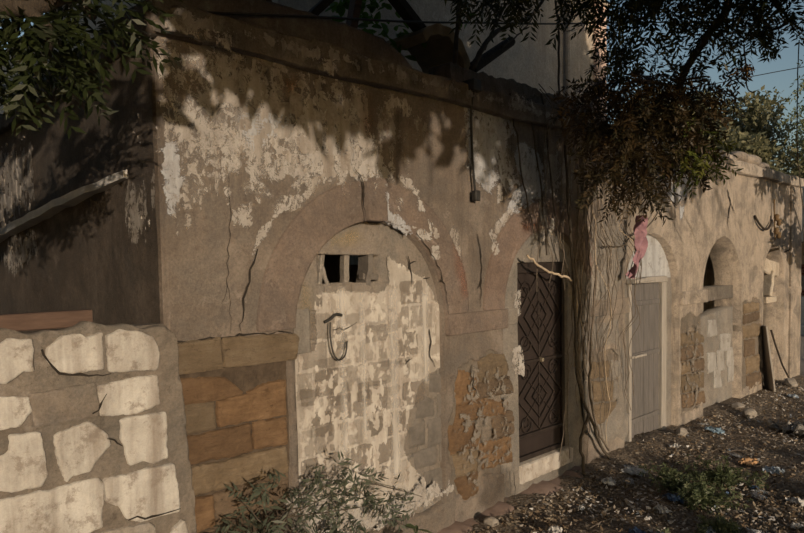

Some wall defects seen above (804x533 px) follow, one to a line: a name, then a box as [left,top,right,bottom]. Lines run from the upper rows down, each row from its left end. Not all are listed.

peeling [0,136,35,227]
peeling [1,230,38,277]
peeling [124,141,185,249]
crack [177,177,292,343]
peeling [163,8,440,261]
peeling [463,107,555,256]
peeling [665,169,692,219]
peeling [177,255,525,533]